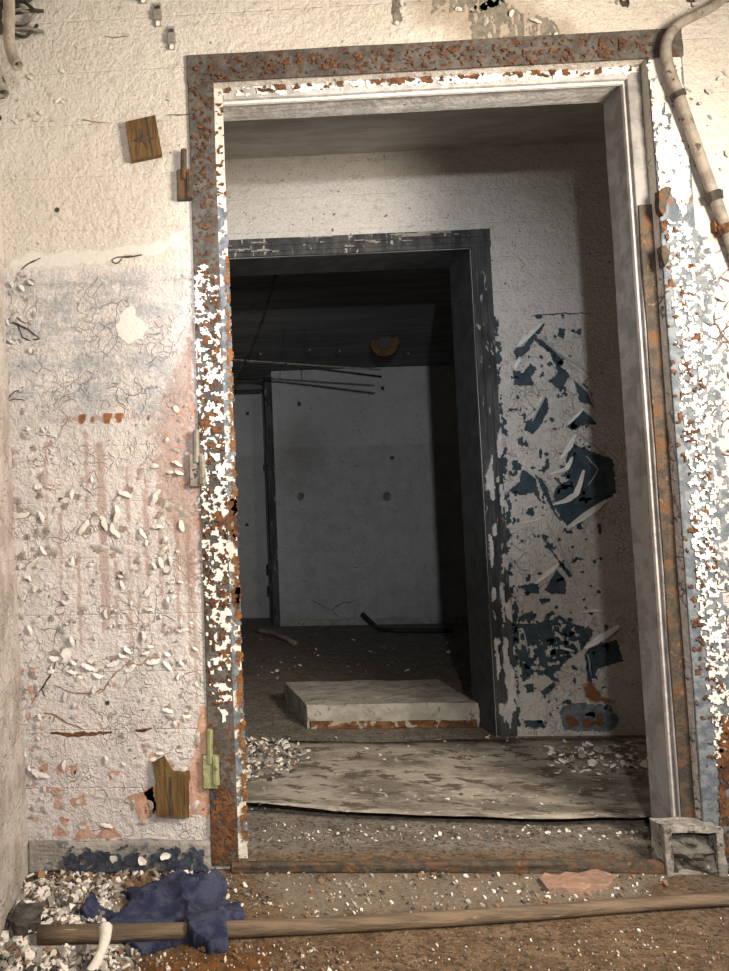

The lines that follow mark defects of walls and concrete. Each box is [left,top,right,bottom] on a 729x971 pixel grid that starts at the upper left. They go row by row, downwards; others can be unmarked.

peeling [214,71,540,113]
peeling [345,230,459,247]
rust [665,246,697,327]
rust [671,329,706,398]
peeling [553,57,729,766]
rust [676,401,712,494]
peeling [8,127,279,874]
peeling [485,314,624,732]
rust [684,500,729,863]